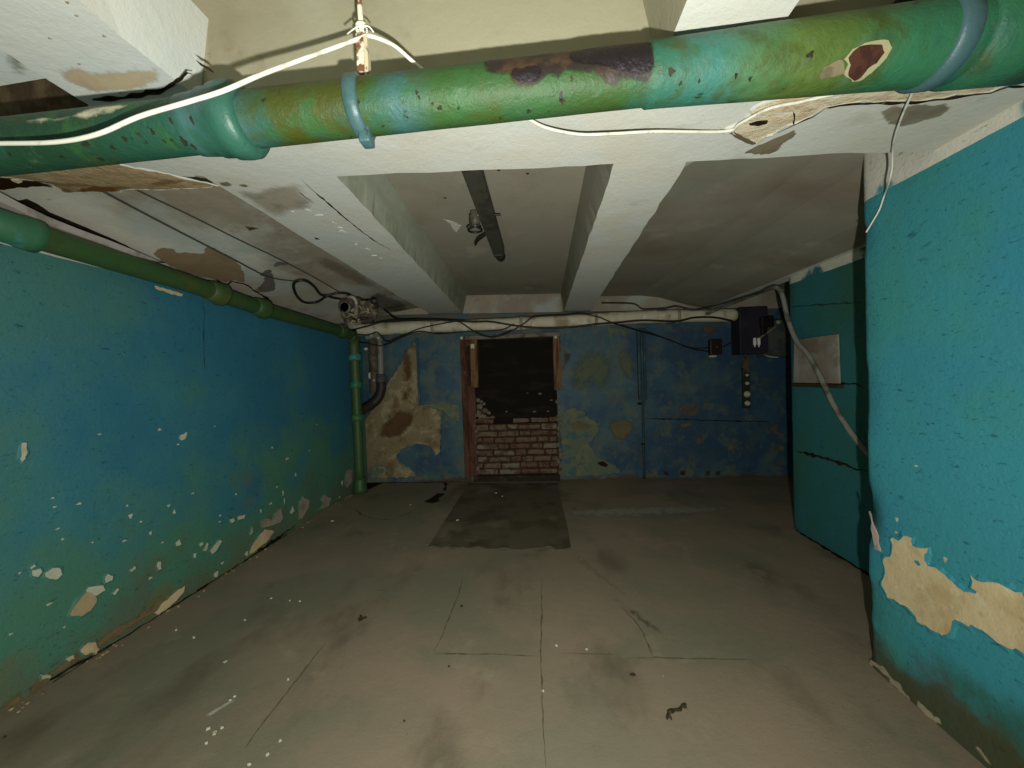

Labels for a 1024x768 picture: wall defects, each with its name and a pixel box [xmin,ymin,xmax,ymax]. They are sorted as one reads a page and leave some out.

spalling [0,72,191,117]
spalling [723,40,1024,145]
water stain [882,104,949,126]
spalling [0,164,346,233]
crack [301,182,389,249]
water stain [154,247,245,283]
peeling [365,341,460,483]
crack [797,451,867,472]
peeling [219,468,353,556]
peeling [62,572,120,628]
peeling [869,511,1024,659]
peeling [0,584,186,712]